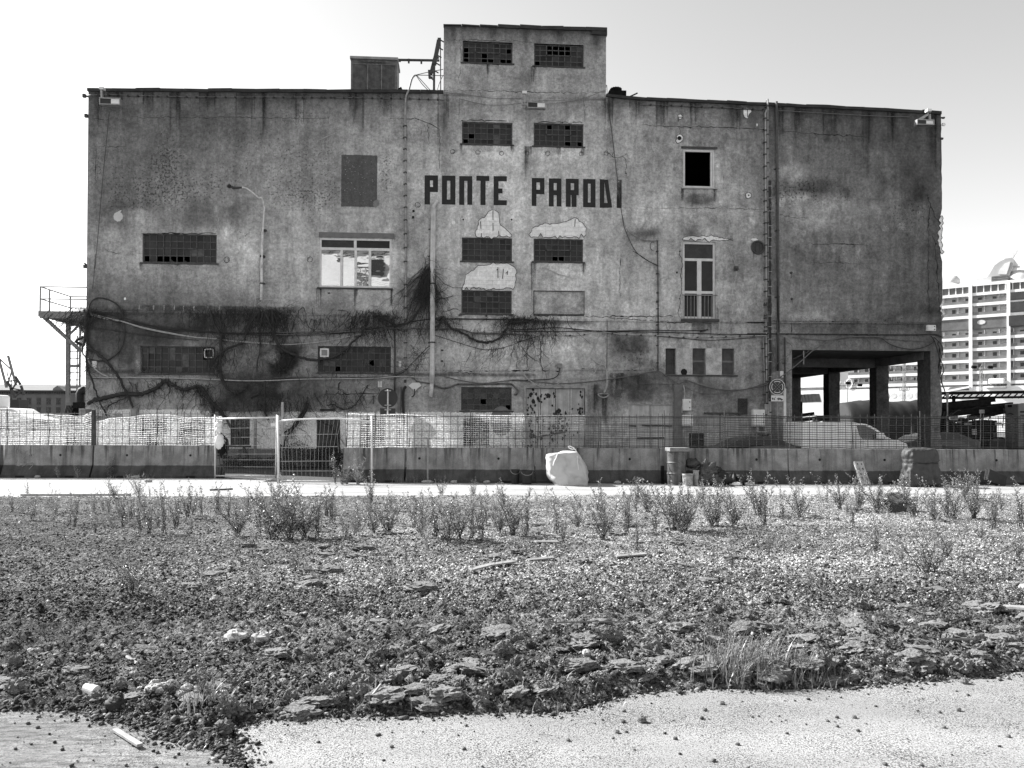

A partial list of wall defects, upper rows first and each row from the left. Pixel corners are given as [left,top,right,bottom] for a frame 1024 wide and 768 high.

flaking render [475,210,513,239]
flaking render [529,217,587,239]
flaking render [462,263,517,291]